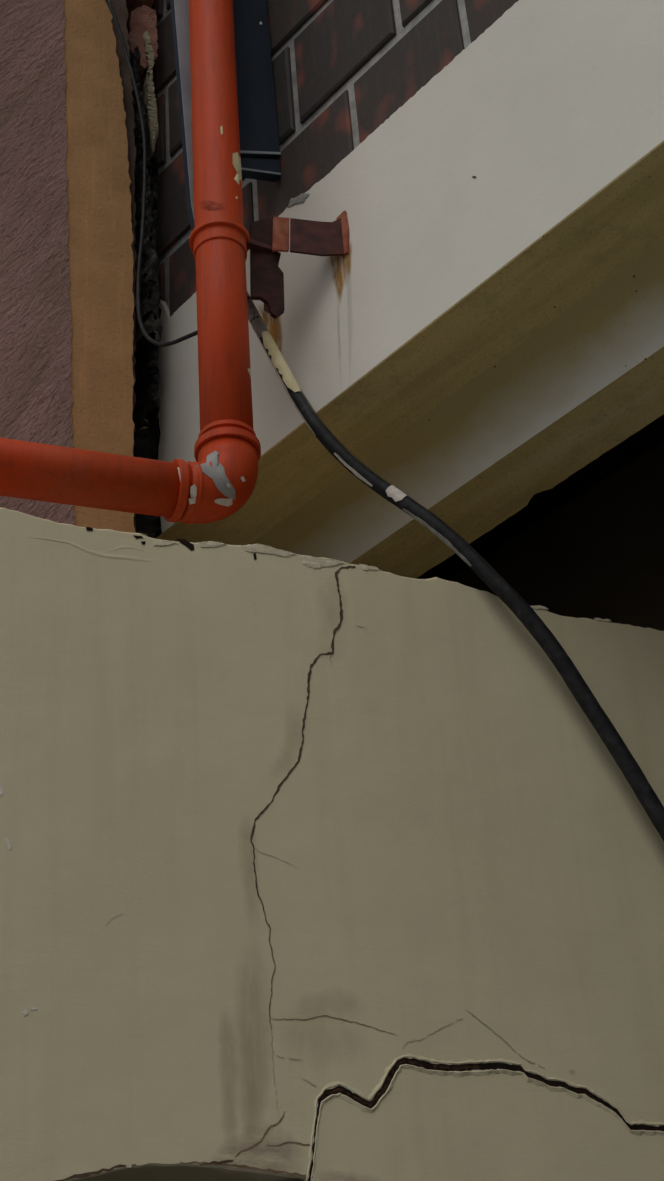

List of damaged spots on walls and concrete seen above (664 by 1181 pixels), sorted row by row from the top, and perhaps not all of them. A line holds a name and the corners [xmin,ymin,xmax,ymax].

corrosion [332,249,351,295]
crack [200,566,664,1181]